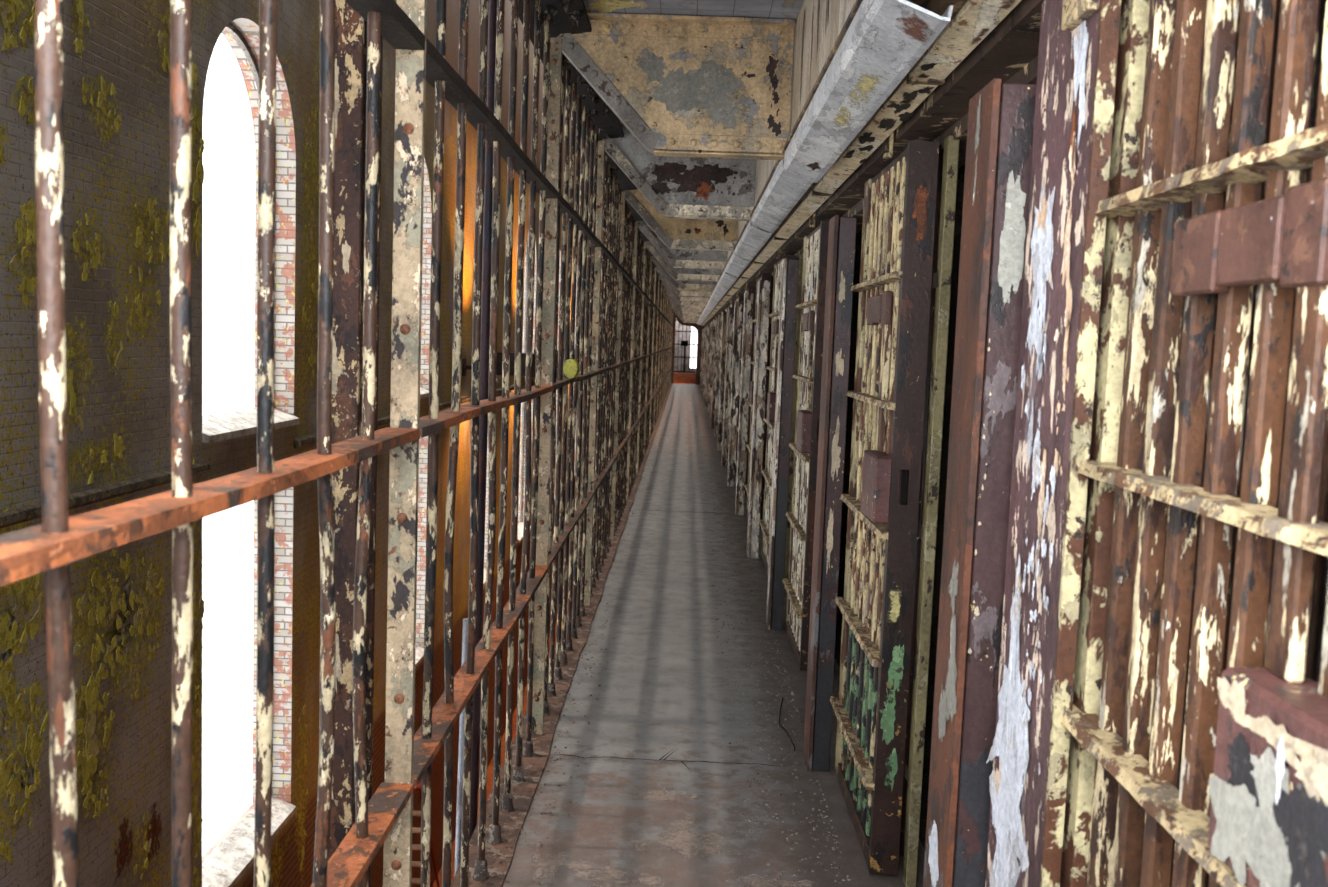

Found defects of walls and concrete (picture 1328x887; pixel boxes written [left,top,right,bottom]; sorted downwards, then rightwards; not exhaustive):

peeling [637,53,782,137]
peeling [1074,20,1089,145]
peeling [650,162,748,201]
peeling [987,170,1072,887]
peeling [879,644,904,791]
peeling [889,591,901,622]
peeling [938,558,972,741]
peeling [1209,677,1328,887]